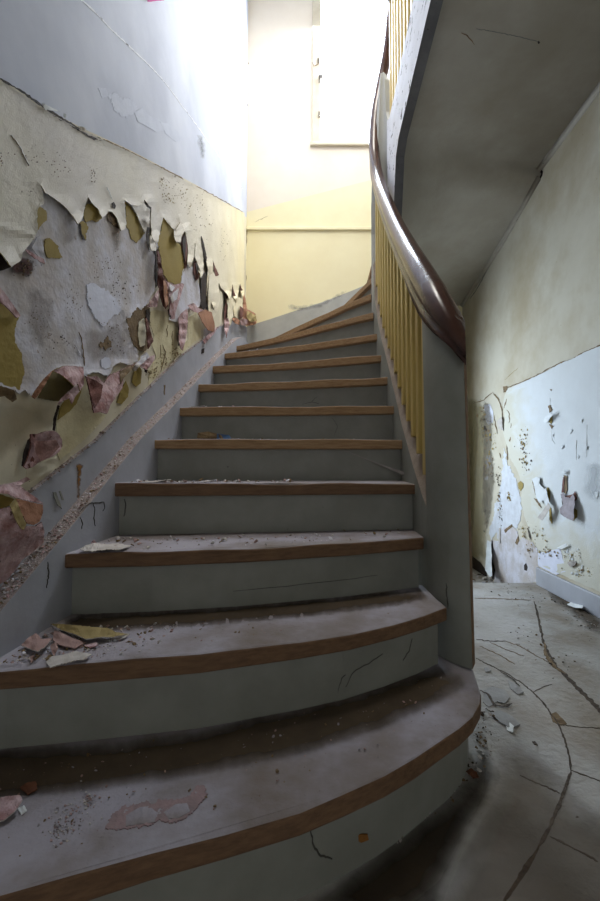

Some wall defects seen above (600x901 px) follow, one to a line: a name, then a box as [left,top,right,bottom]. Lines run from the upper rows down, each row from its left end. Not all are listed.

peeling [0,81,257,584]
peeling [472,346,600,592]
spalling [42,785,208,848]
crack [476,598,600,901]